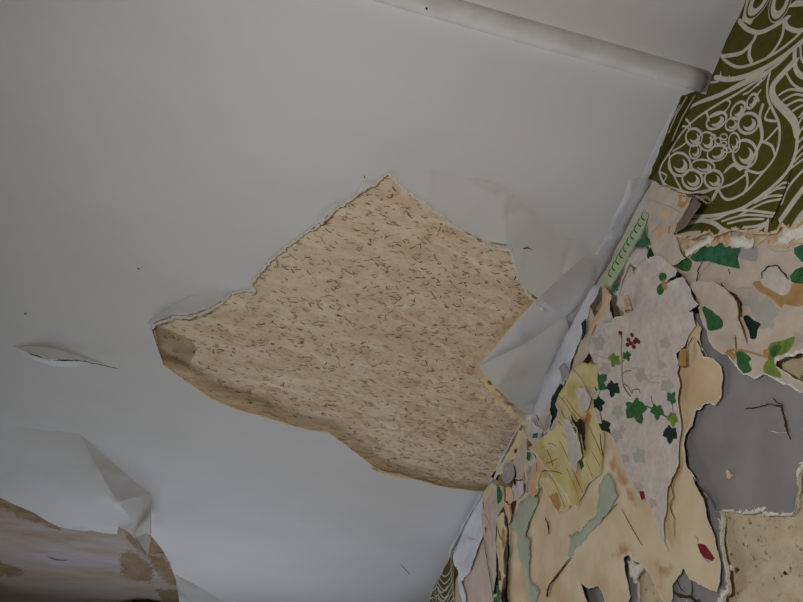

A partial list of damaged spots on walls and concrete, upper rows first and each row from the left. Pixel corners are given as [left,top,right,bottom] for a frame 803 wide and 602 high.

peeling [624,313,803,602]
flaking render [455,535,494,602]
peeling [510,495,539,602]
peeling [568,473,618,559]
peeling [585,586,605,602]